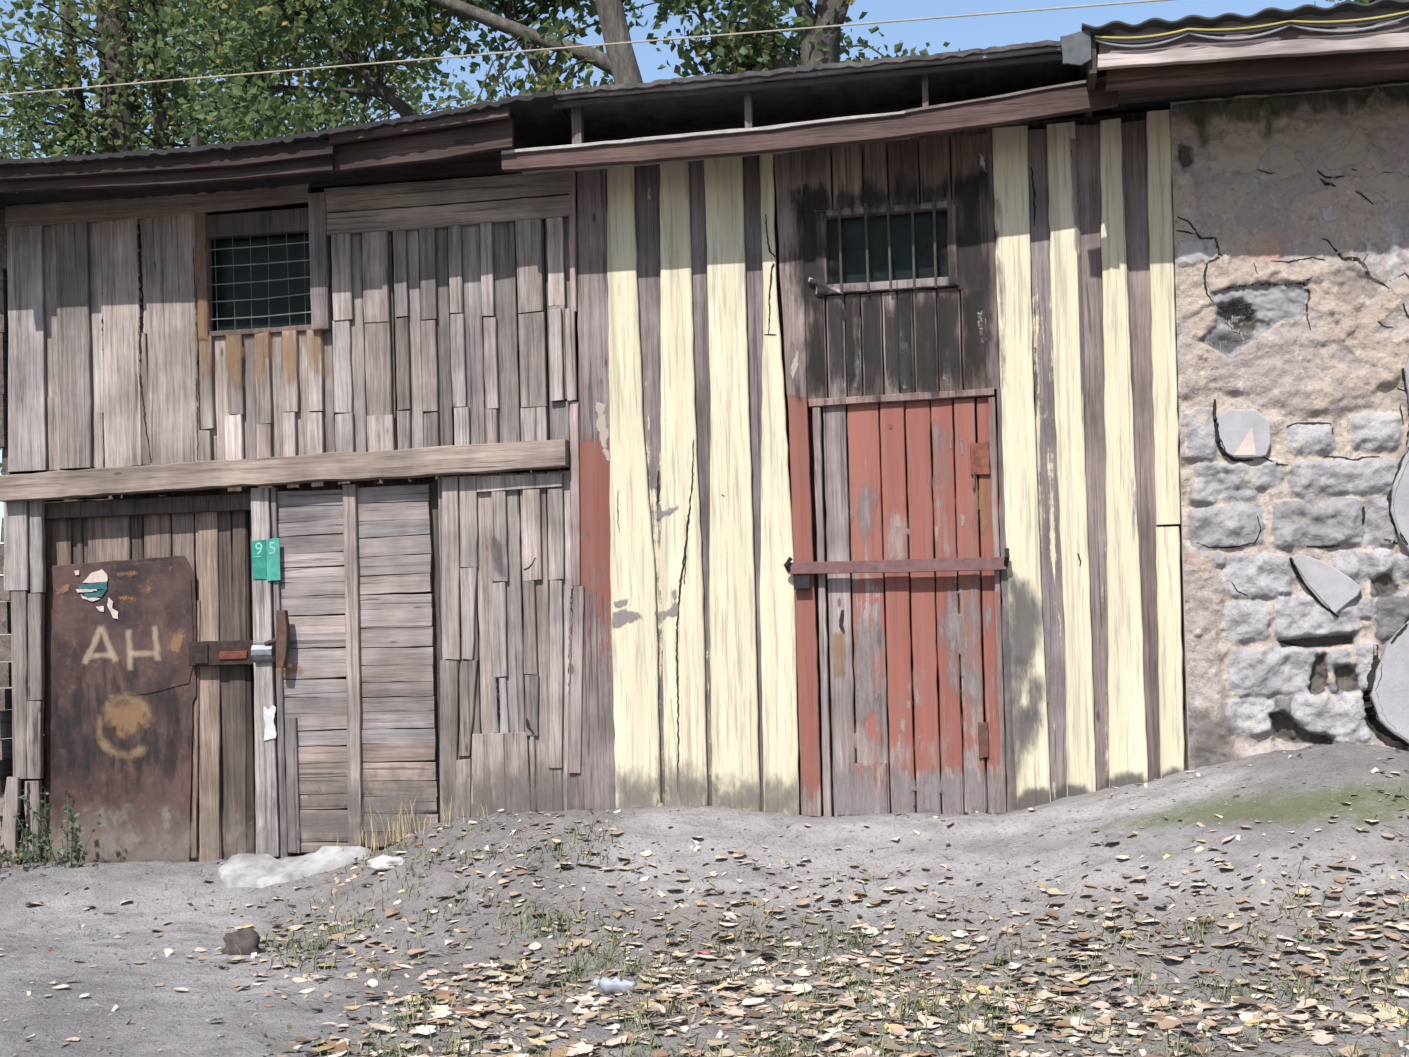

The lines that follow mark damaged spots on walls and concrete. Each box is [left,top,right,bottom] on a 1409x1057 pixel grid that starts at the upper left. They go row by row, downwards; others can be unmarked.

crack [1176,216,1409,330]
crack [137,224,152,463]
spalling [1198,276,1310,358]
peeling [1212,399,1271,462]
crack [1286,368,1409,548]
rust [170,632,183,652]
crack [656,439,725,774]
spalling [1283,635,1358,694]
peeling [1289,554,1398,617]
crack [1363,618,1409,747]
rust [99,697,149,757]
spalling [1270,713,1333,745]